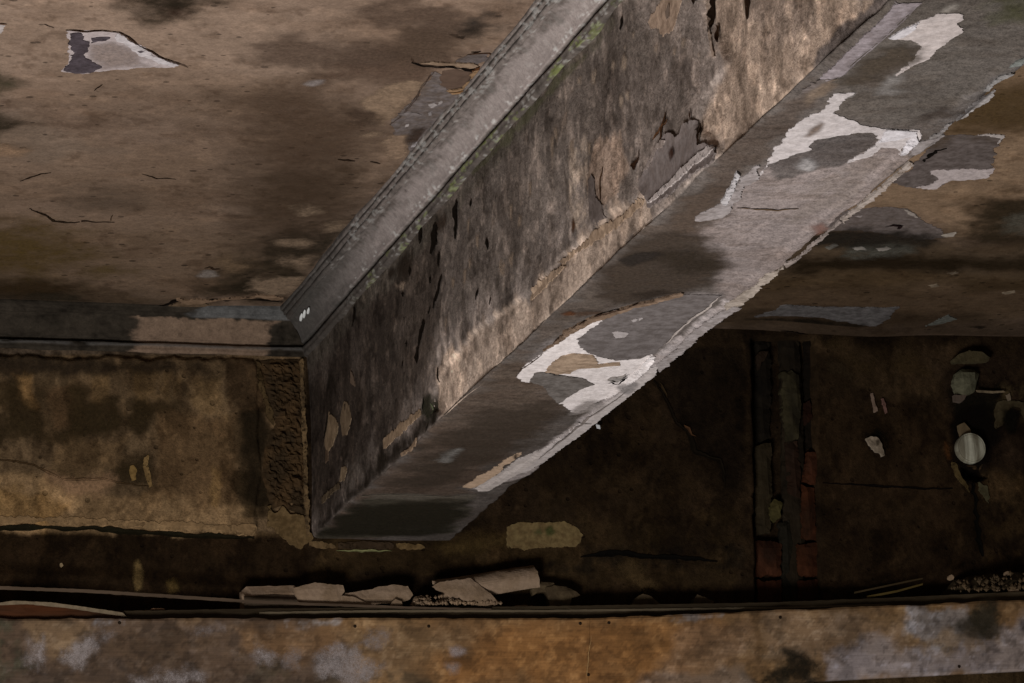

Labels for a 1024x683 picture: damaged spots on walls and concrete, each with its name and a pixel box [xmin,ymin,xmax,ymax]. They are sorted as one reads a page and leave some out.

peeling [61,30,188,74]
water stain [123,0,195,24]
water stain [257,0,482,83]
crack [29,208,115,223]
water stain [218,223,333,296]
water stain [599,188,727,303]
peeling [361,0,1024,500]
water stain [0,356,166,444]
water stain [113,455,153,488]
flaking render [0,358,425,553]
water stain [318,395,467,536]
flaking render [441,521,583,552]